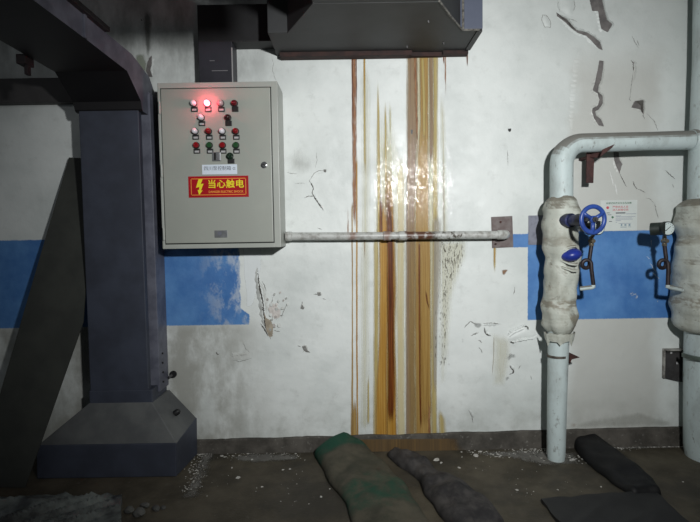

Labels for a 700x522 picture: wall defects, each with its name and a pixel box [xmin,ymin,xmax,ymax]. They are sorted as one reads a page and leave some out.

spalling [556,0,614,50]
spalling [589,60,605,127]
spalling [631,98,646,119]
crack [287,153,326,209]
peeling [244,248,289,339]
rust [347,57,457,452]
damp [436,240,463,320]